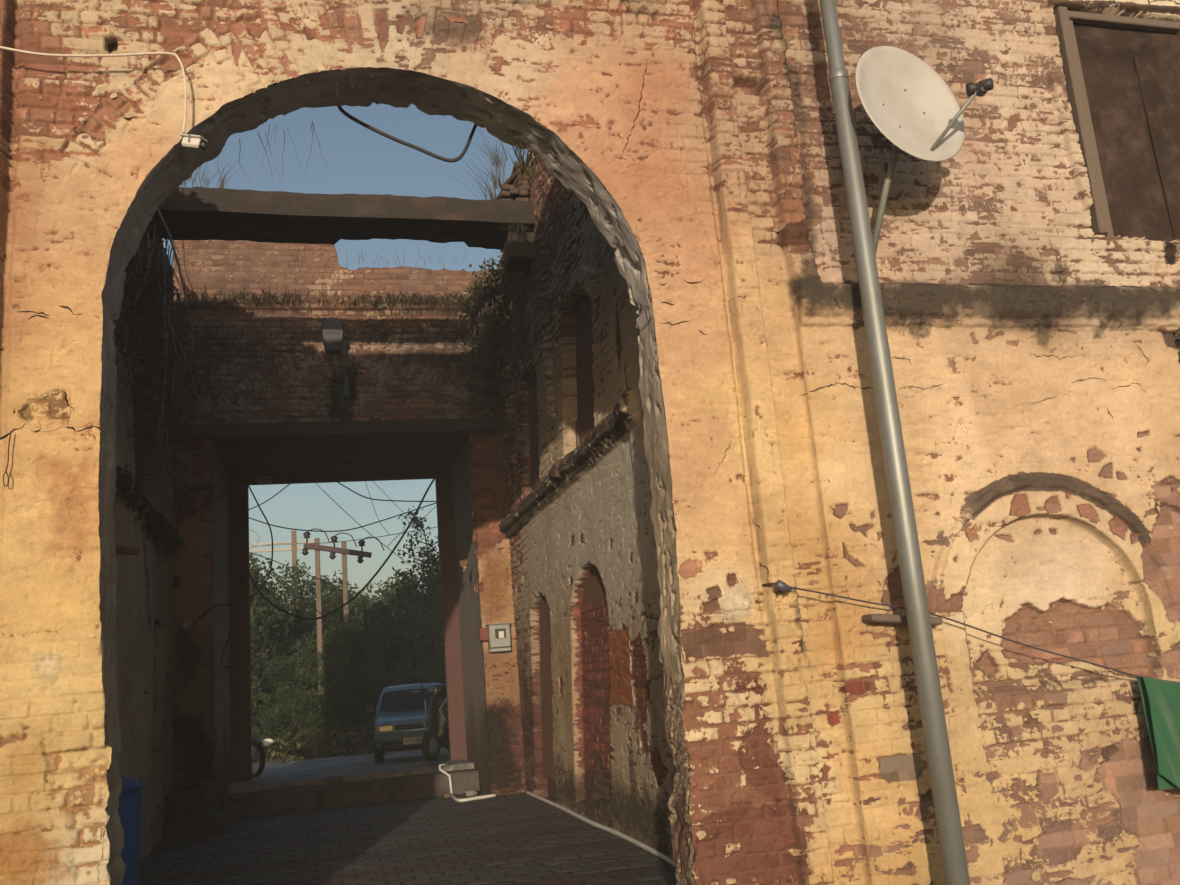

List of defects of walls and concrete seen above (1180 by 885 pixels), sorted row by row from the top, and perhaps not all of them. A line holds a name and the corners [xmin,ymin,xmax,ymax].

spalling [106,36,118,53]
leakage [790,167,862,314]
leakage [880,266,1180,337]
spalling [15,388,70,432]
crack [65,392,104,433]
peeling [1071,447,1129,480]
peeling [1010,474,1180,623]
peeling [676,557,771,665]
spalling [975,596,1180,681]
spalling [692,675,814,885]
spalling [1078,732,1180,885]
spalling [1003,819,1091,885]